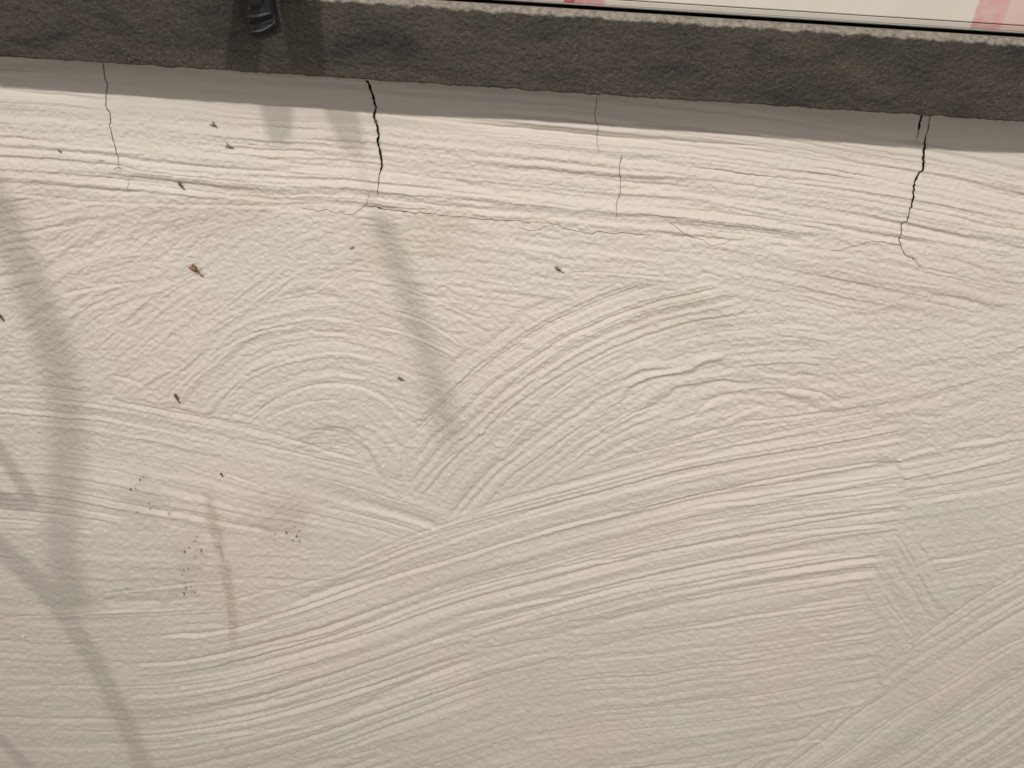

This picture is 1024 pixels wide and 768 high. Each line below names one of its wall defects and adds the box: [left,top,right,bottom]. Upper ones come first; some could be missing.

crack [98,64,129,190]
crack [303,80,729,246]
crack [838,116,930,263]